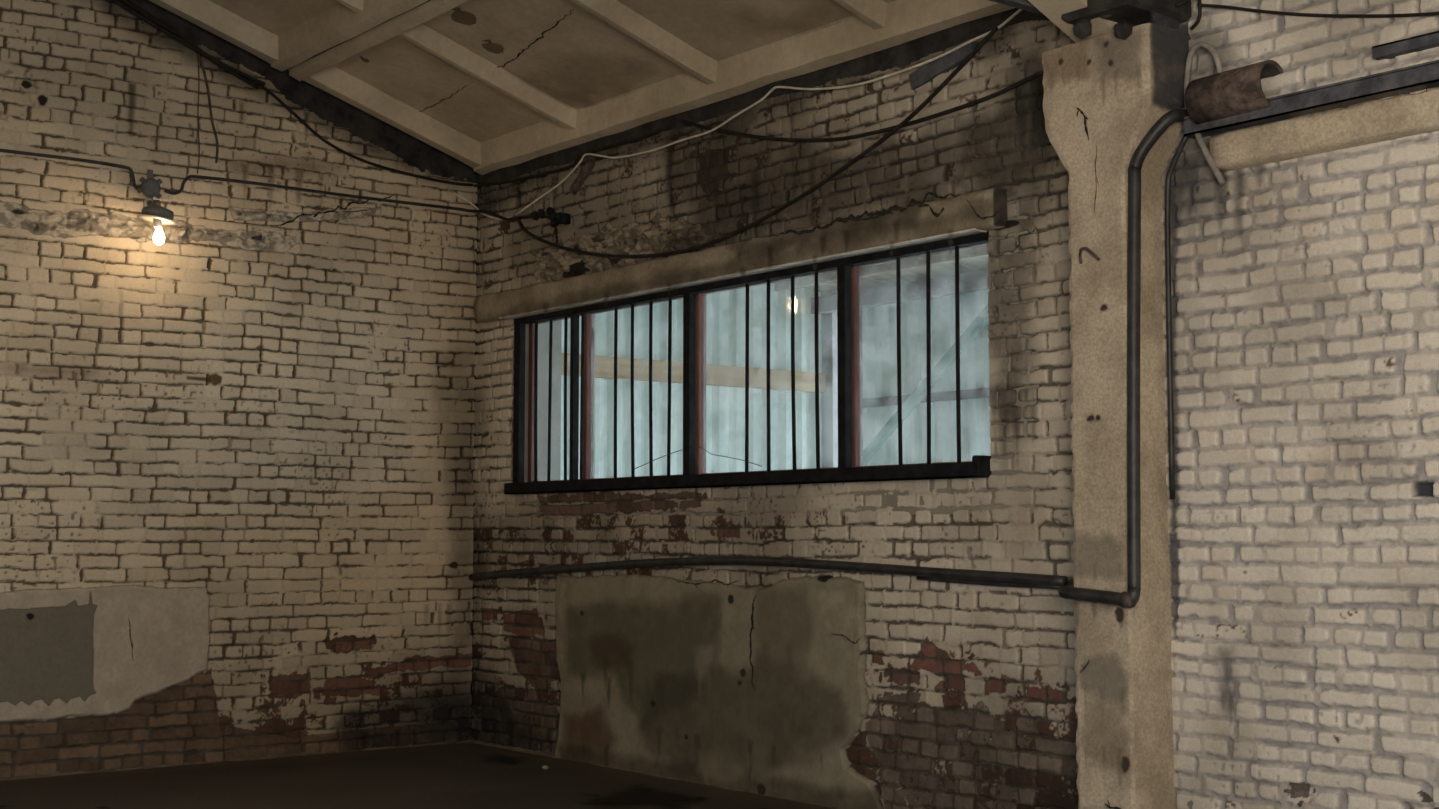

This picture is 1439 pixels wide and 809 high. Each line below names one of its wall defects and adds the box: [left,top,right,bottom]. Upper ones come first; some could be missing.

crack [419,9,574,112]
peeling [268,632,472,707]
peeling [481,606,558,702]
crack [674,579,756,690]
flaking render [0,668,462,777]
flaking render [860,637,1078,809]
peeling [1284,782,1315,807]
peeling [1417,791,1439,809]